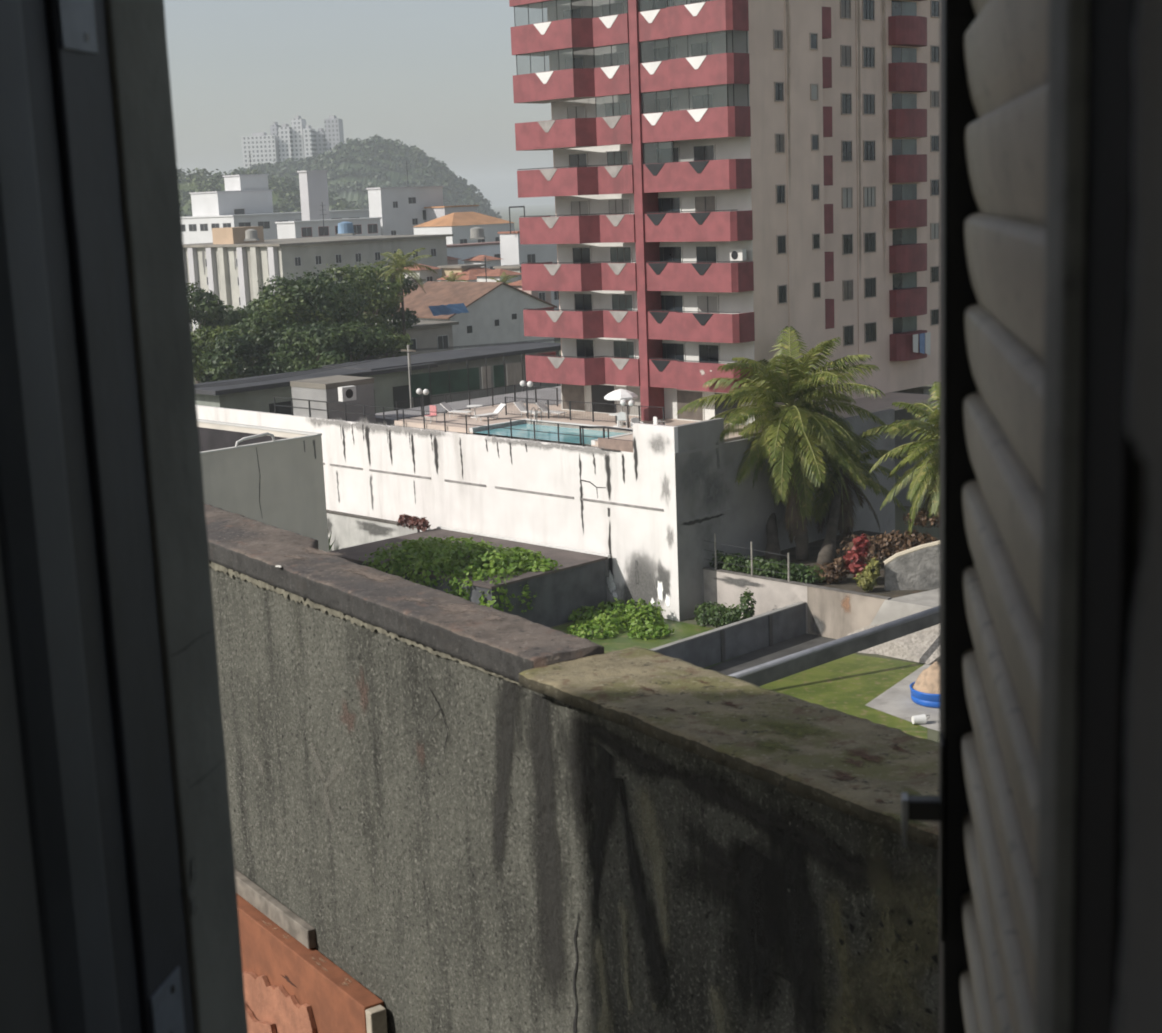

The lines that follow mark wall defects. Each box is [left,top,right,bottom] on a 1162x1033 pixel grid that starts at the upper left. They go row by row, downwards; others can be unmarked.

damp [651,438,663,451]
damp [485,437,638,576]
damp [622,557,670,617]
damp [493,677,889,1033]
crack [572,913,580,1033]